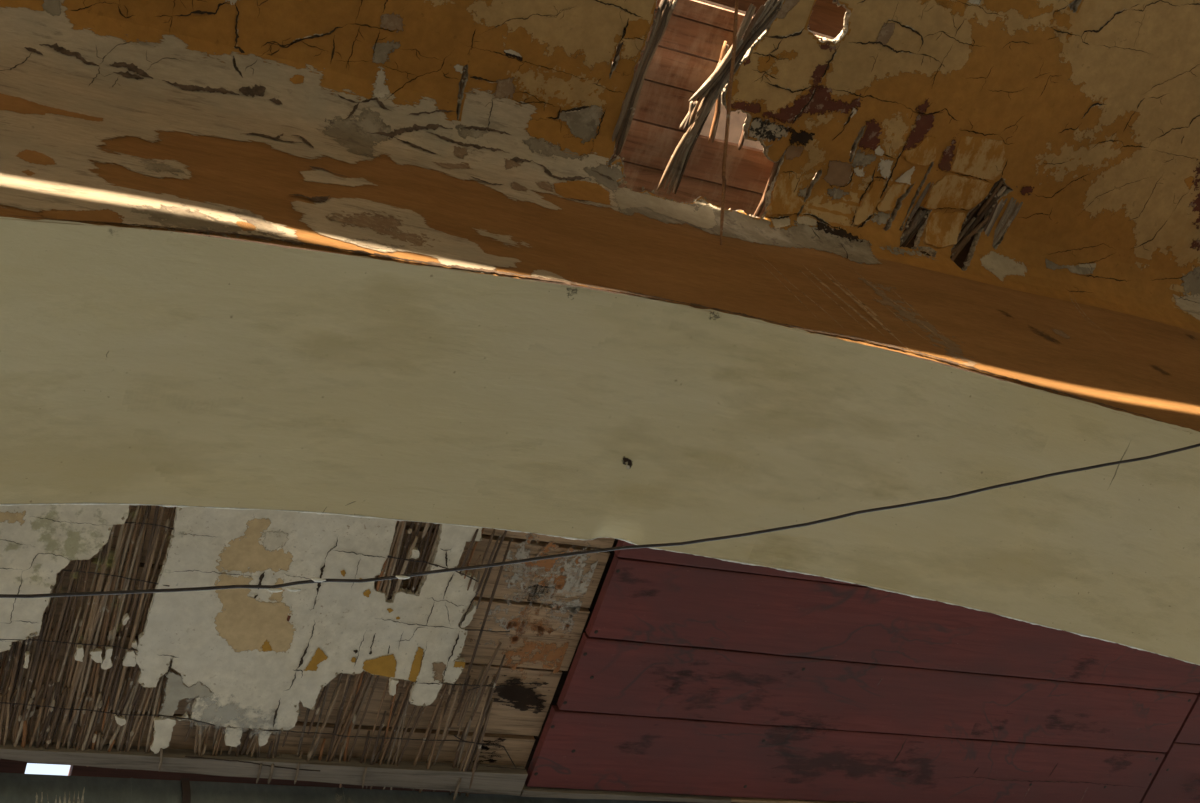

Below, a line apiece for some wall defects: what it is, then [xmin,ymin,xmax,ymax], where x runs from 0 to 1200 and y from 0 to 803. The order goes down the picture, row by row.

crack [72,0,643,138]
peeling [0,0,1200,321]
crack [766,146,905,259]
crack [752,0,1200,183]
crack [1022,64,1200,303]
crack [0,516,94,642]
peeling [158,672,214,719]
crack [166,537,385,729]
crack [354,549,475,685]
peeling [432,662,446,683]
damp [471,533,598,714]